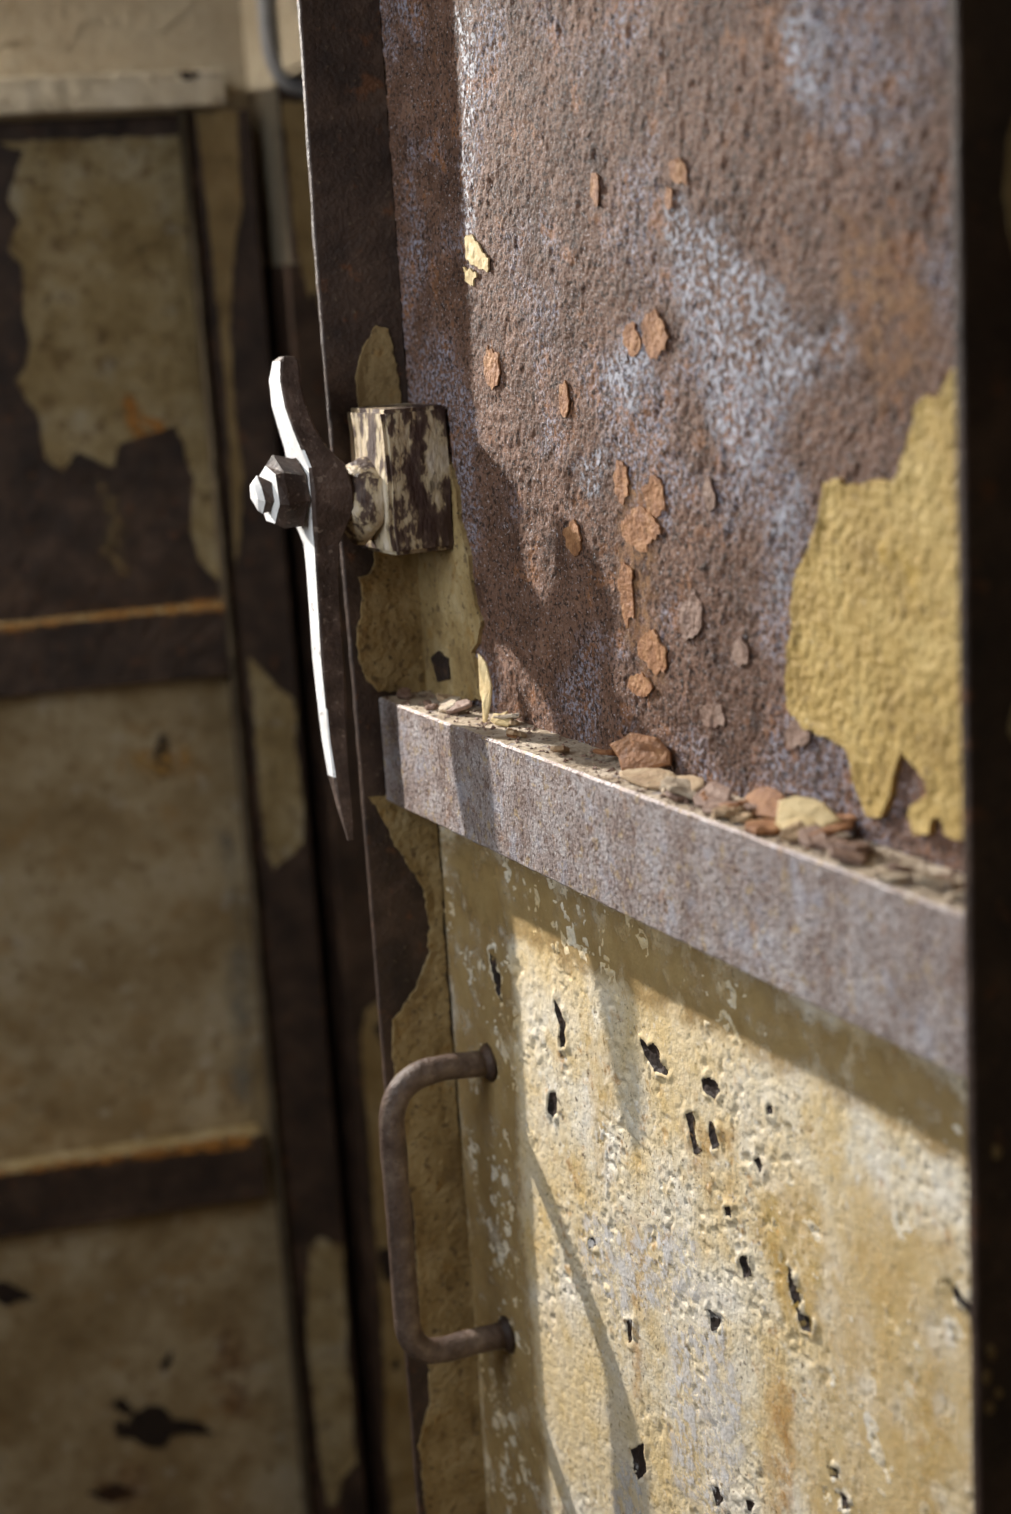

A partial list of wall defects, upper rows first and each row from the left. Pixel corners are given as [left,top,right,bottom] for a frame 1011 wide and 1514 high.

peeling [0,110,244,580]
corrosion [483,345,501,391]
corrosion [622,309,670,360]
corrosion [613,459,668,697]
corrosion [679,588,704,642]
corrosion [609,732,676,791]
corrosion [745,786,786,819]
spalling [554,1000,566,1047]
spalling [640,1038,668,1075]
spalling [547,1092,557,1119]
spalling [701,1077,720,1099]
spalling [685,1112,720,1154]